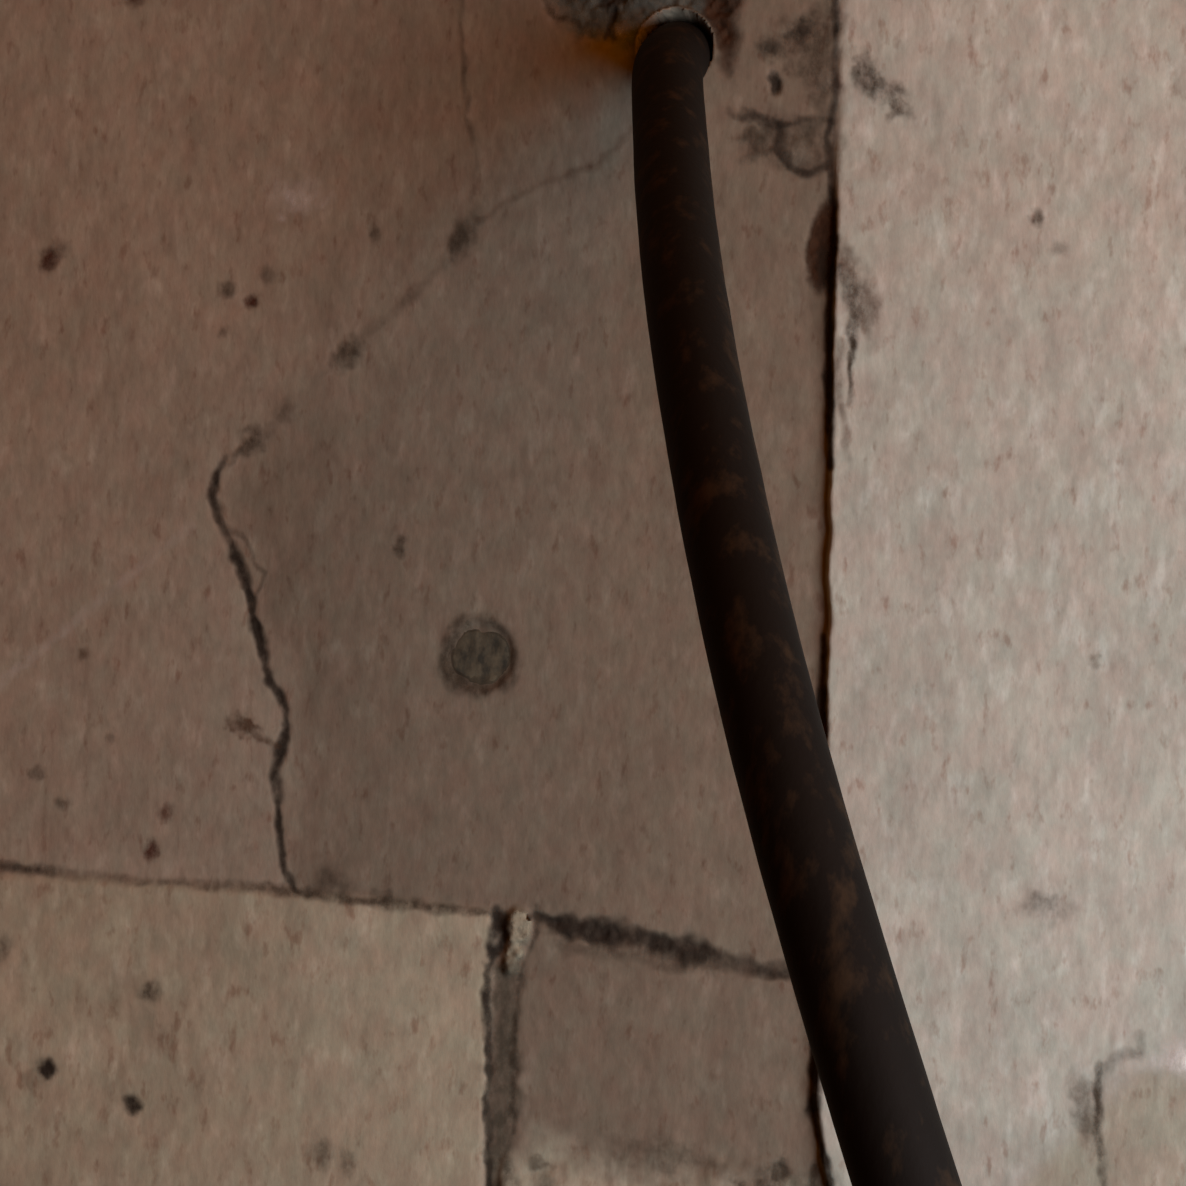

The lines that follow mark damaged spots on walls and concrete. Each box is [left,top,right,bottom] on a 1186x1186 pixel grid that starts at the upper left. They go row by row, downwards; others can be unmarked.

crack [450,224,469,252]
water stain [848,302,864,388]
crack [209,432,296,894]